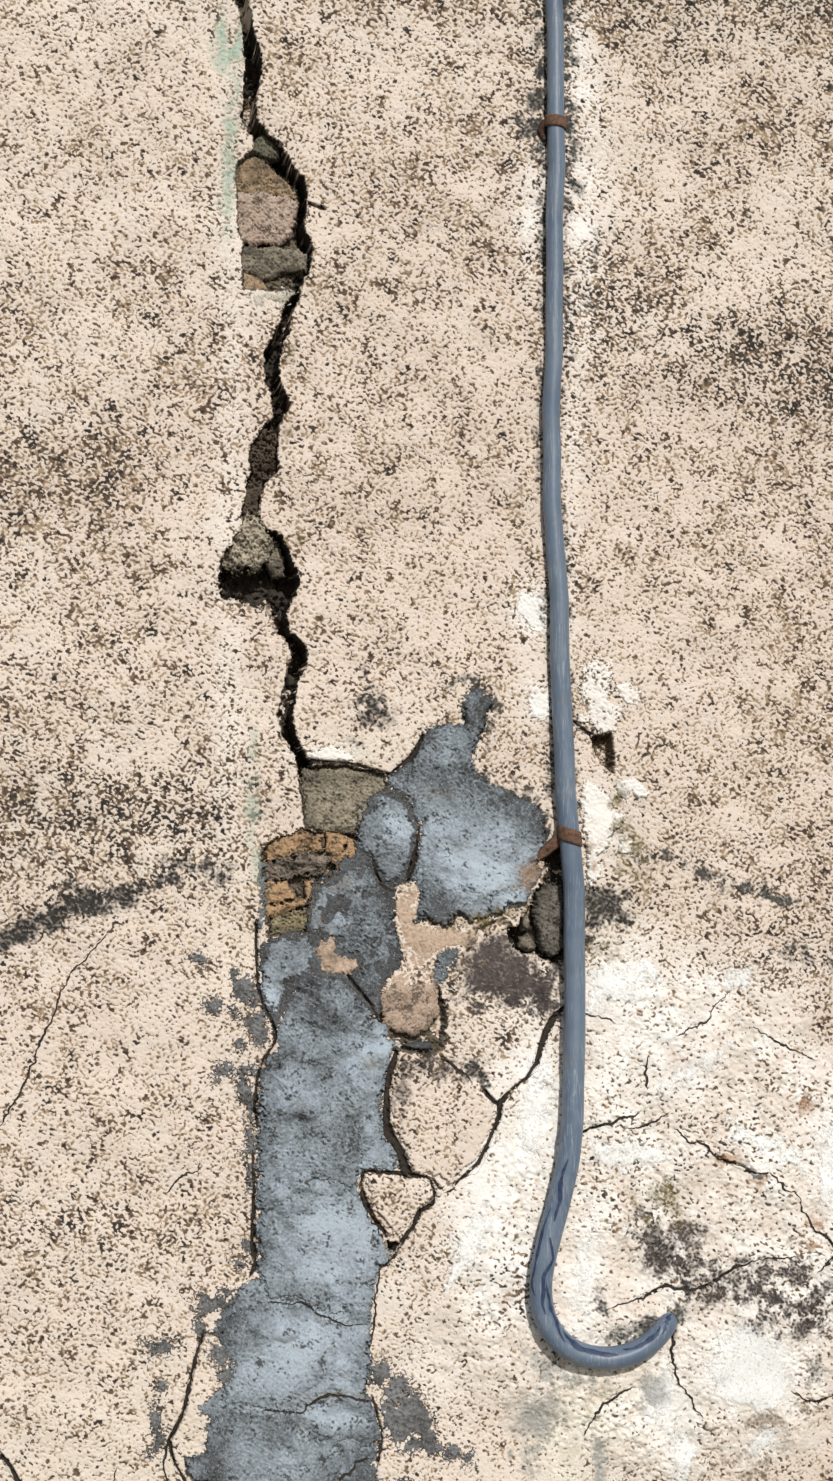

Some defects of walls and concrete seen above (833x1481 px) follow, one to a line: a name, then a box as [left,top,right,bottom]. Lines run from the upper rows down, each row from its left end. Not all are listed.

crack [234,0,425,814]
spalling [257,745,389,977]
peeling [364,883,497,1255]
crack [249,922,614,1351]
leakage [445,932,564,1021]
spalling [506,848,564,964]
crack [583,991,833,1311]
leakage [769,938,833,970]
crack [0,1454,21,1481]
crack [669,1333,705,1419]
leakage [594,1176,833,1385]
leakage [746,1413,784,1427]